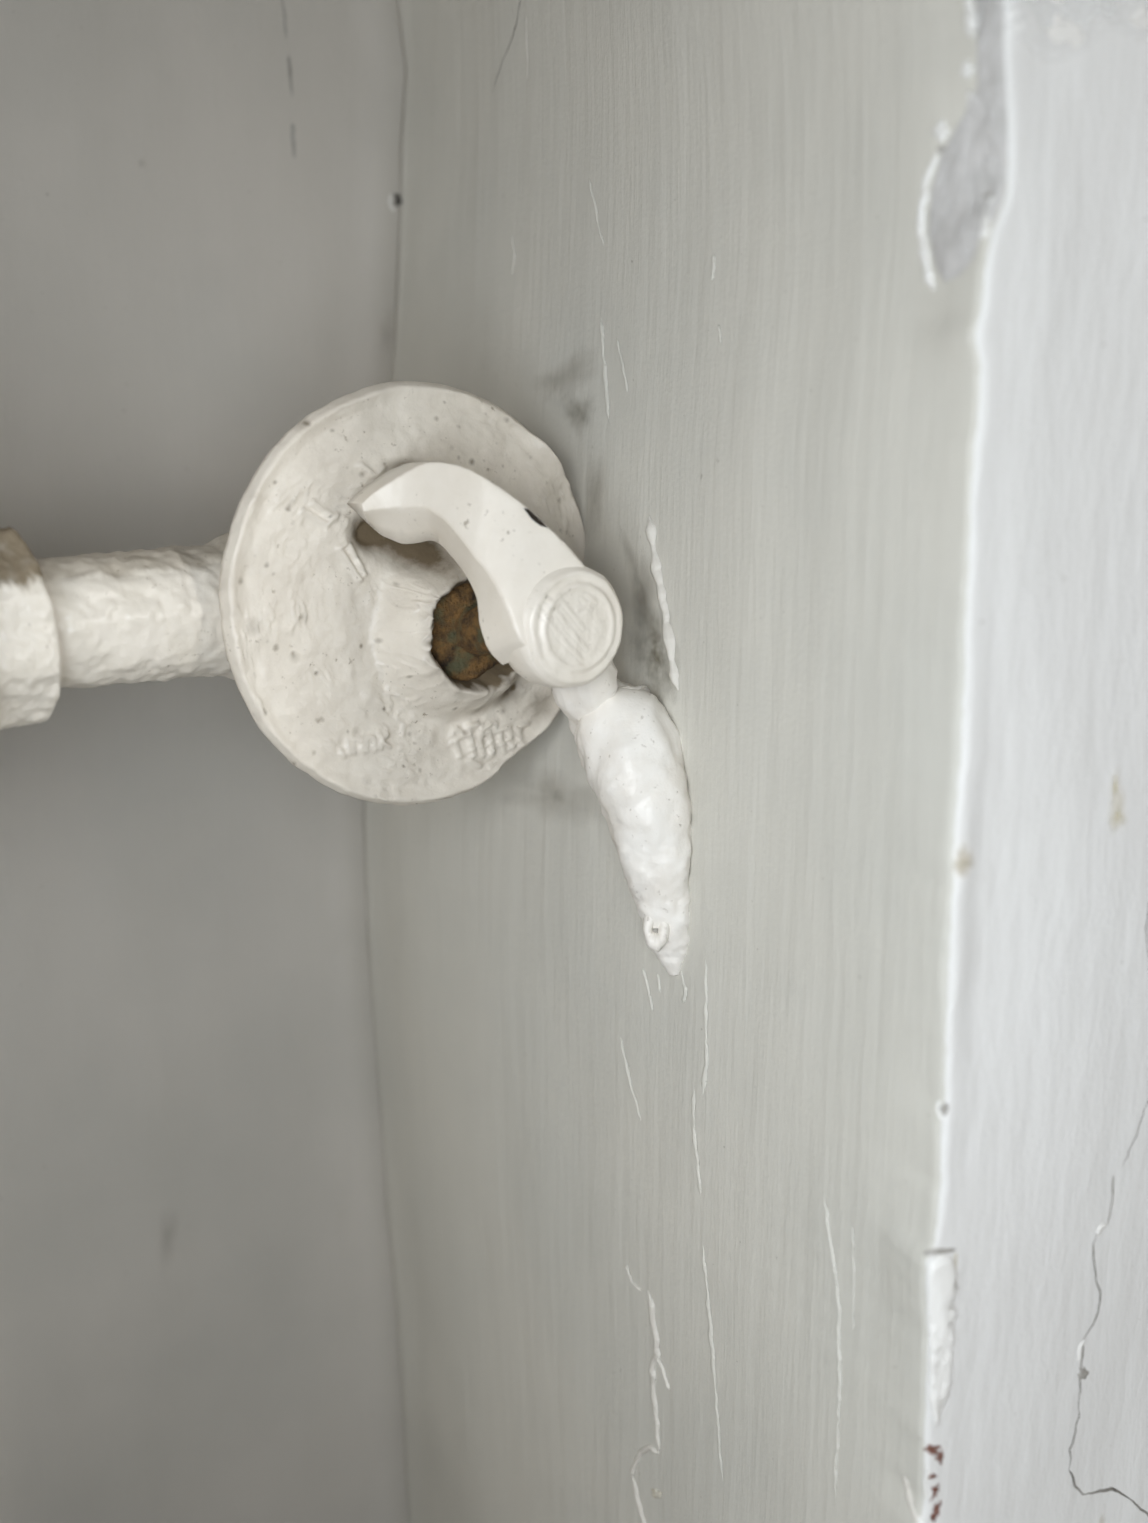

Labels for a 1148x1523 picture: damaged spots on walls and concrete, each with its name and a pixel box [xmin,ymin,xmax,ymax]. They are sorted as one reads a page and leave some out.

spalling [916,0,1008,291]
crack [1069,1102,1148,1516]